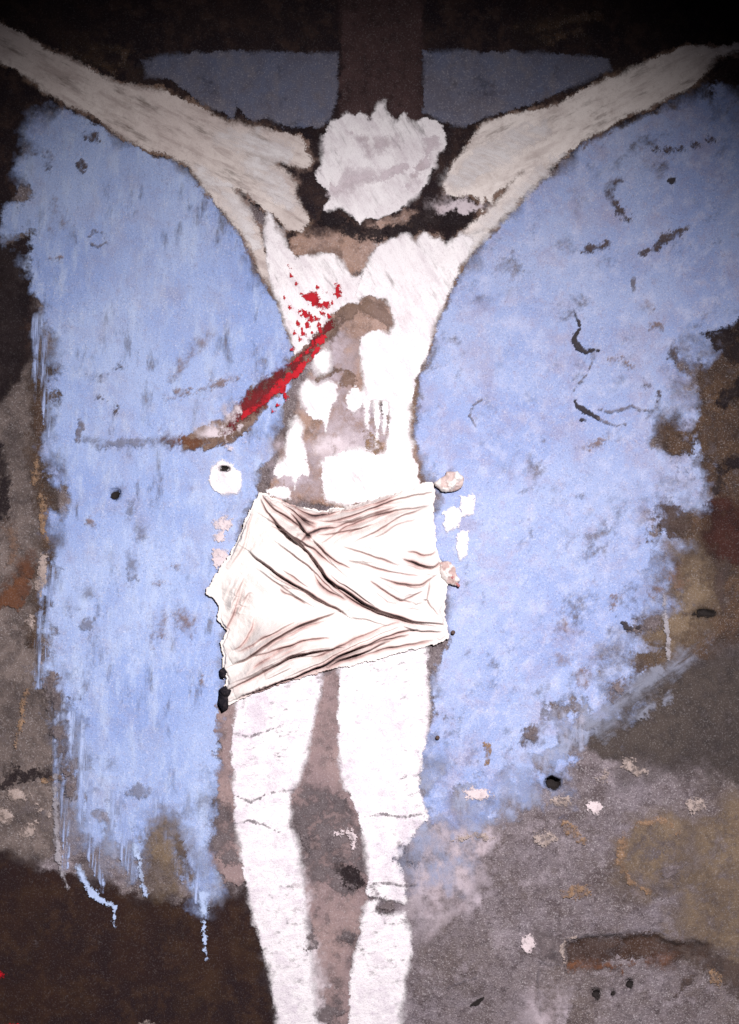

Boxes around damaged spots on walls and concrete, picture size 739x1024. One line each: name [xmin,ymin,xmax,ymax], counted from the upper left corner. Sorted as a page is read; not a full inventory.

crack [571,310,654,426]
peeling [521,724,539,746]
spalling [594,757,649,783]
spalling [462,786,495,801]
spalling [585,801,603,815]
spalling [685,797,706,815]
spalling [533,820,586,847]
peeling [392,839,421,867]
spalling [521,929,739,999]
spalling [526,998,568,1024]